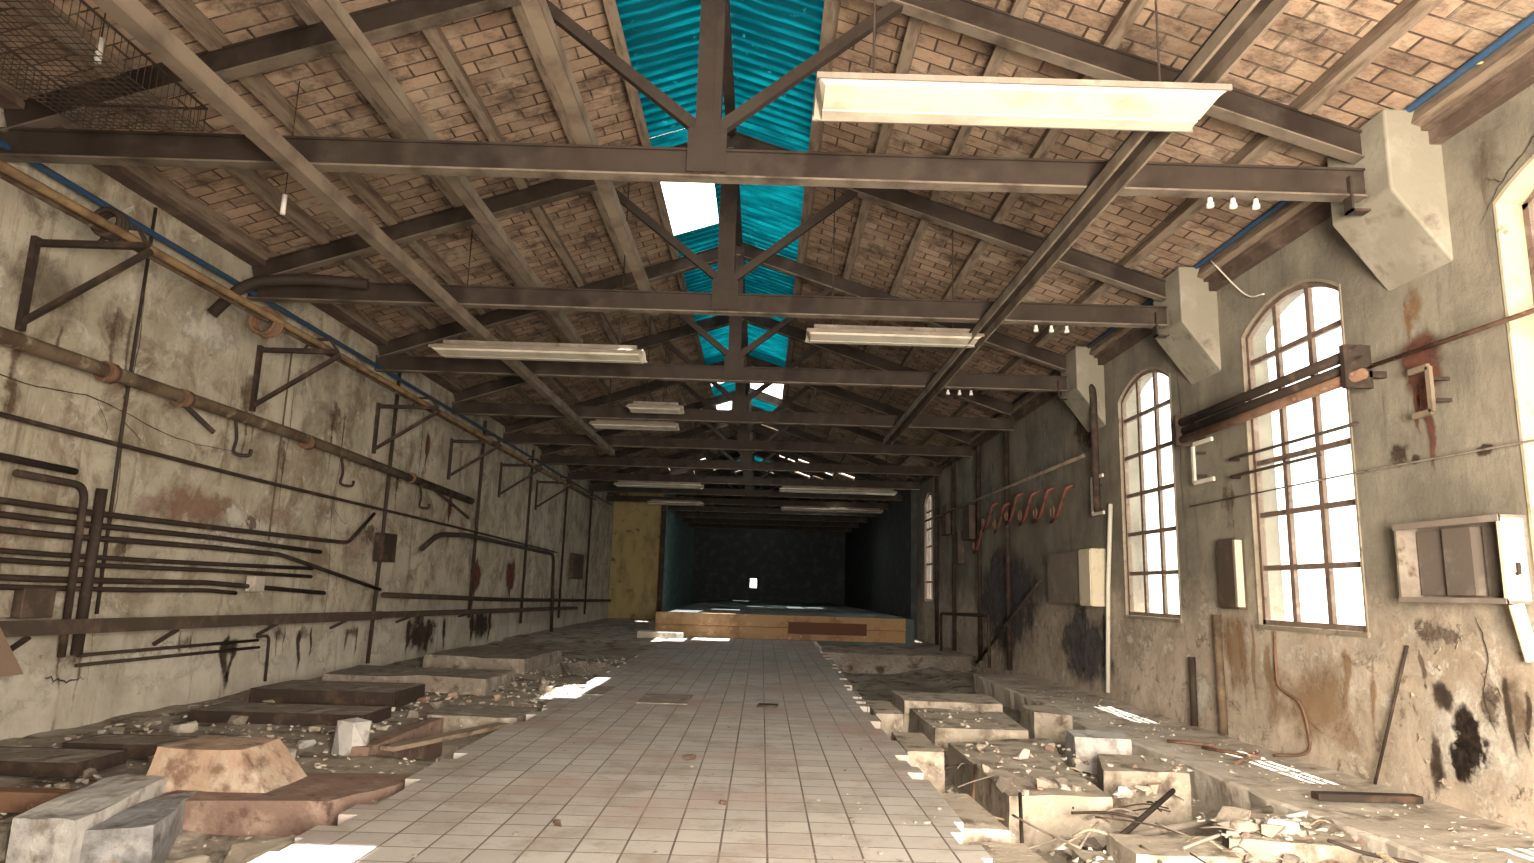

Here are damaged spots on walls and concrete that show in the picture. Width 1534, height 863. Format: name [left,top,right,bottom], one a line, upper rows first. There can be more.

peeling [134,478,281,554]
leakage [219,635,237,689]
leakage [406,617,446,651]
leakage [1062,605,1106,683]
spalling [1411,620,1532,799]